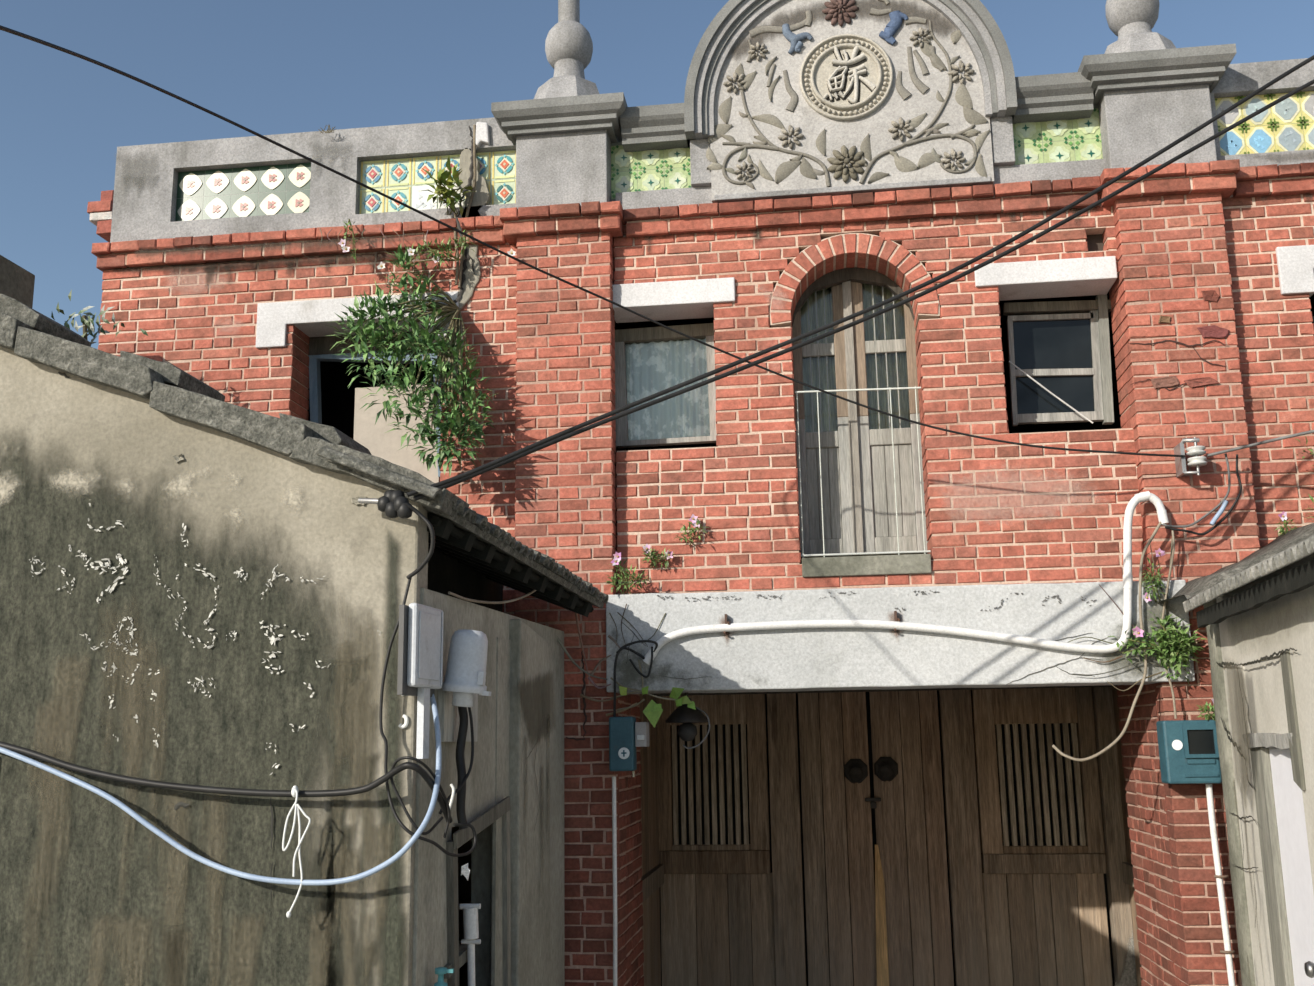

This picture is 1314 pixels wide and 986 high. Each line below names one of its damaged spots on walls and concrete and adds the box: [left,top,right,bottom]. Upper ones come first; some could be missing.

peeling [29,545,128,604]
peeling [80,616,160,701]
peeling [154,555,237,649]
peeling [260,621,309,674]
peeling [261,564,325,599]
crack [1216,647,1297,666]
water stain [31,659,87,902]
water stain [111,630,188,986]
water stain [311,630,391,986]
crack [1221,700,1258,922]
water stain [208,794,260,986]
water stain [90,918,149,986]